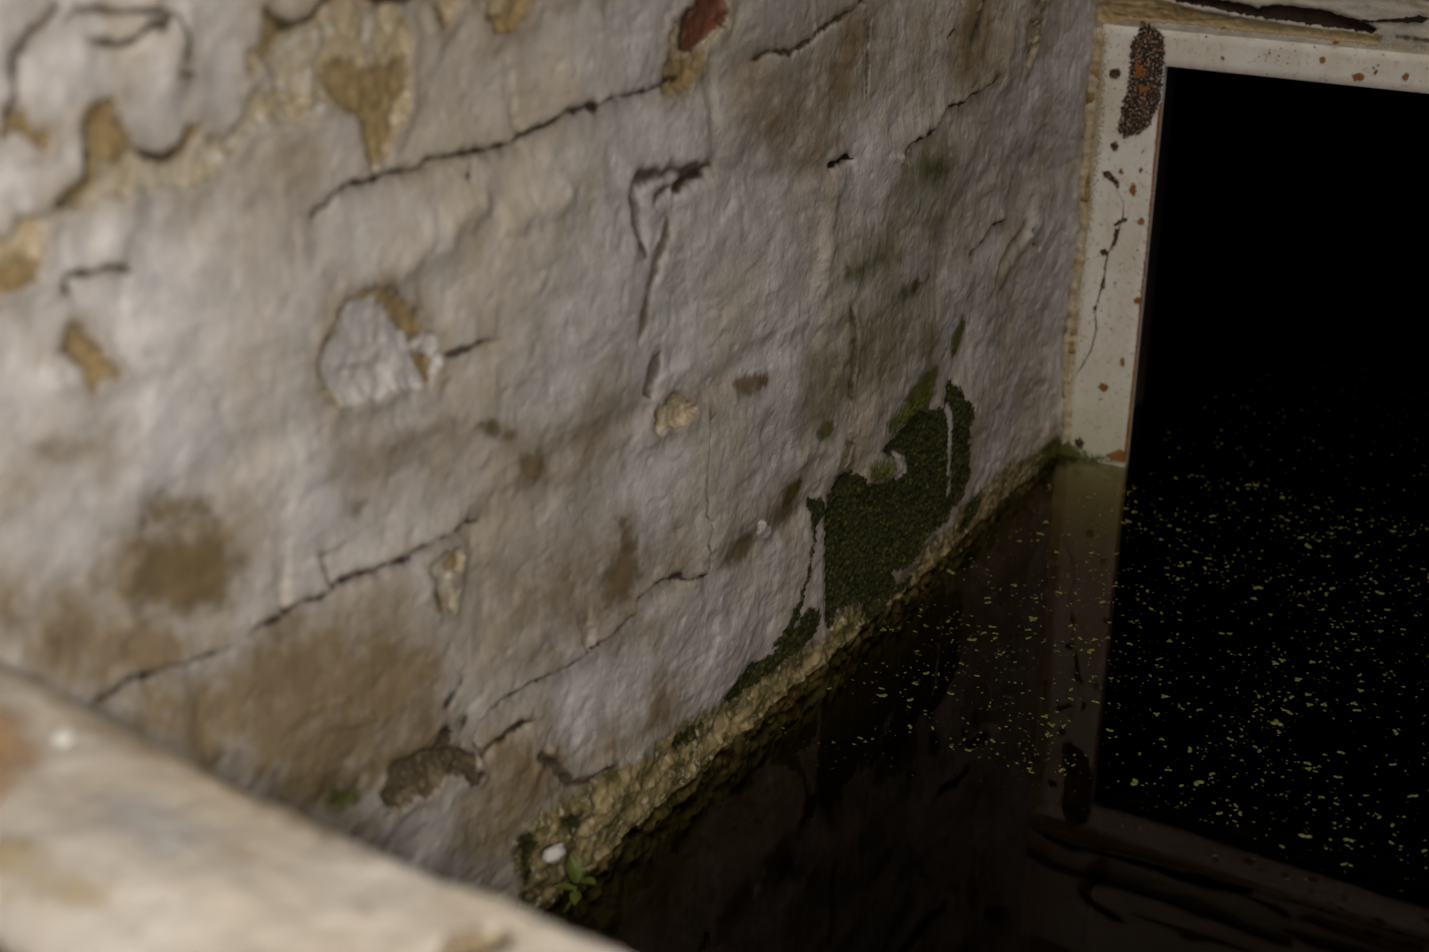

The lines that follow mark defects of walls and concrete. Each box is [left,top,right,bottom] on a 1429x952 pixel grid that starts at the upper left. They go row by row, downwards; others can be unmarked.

crack [1,6,194,140]
spalling [0,0,413,296]
crack [310,85,660,220]
crack [827,153,854,168]
spalling [41,323,119,393]
spalling [317,284,443,409]
crack [629,162,707,399]
corrosion [1074,20,1166,462]
spalling [511,0,1382,920]
crack [254,519,470,629]
crack [474,498,712,785]
spalling [380,726,485,809]